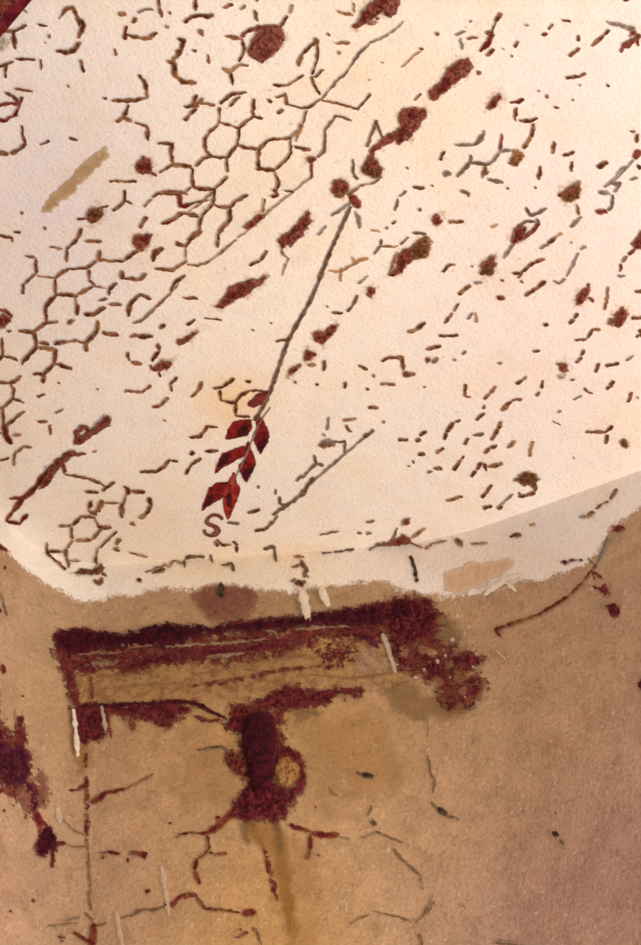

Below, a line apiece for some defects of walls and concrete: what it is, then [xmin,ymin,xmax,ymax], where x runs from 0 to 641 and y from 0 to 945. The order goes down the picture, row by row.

corrosion [0,0,31,37]
crack [0,0,385,466]
crack [455,98,538,197]
crack [596,130,641,215]
crack [46,459,235,574]
crack [292,426,352,503]
corrosion [481,471,540,510]
corrosion [50,582,390,710]
spalling [376,557,514,714]
spalling [0,692,45,819]
corrosion [193,697,308,826]
crack [47,753,262,945]